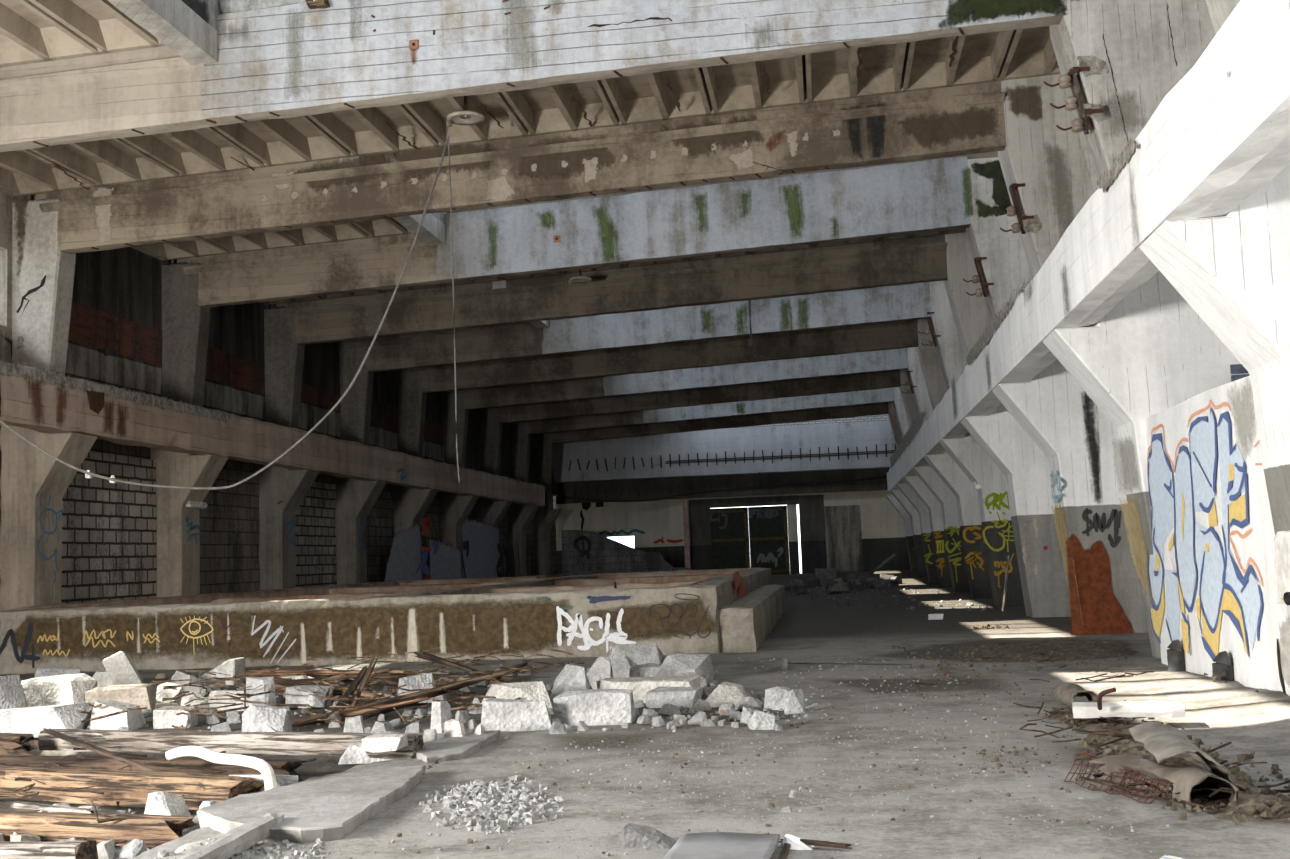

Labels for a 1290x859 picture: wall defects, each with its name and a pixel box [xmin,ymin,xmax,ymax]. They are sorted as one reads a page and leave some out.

crack [588,17,672,27]
crack [16,275,46,314]
rust [28,381,66,425]
rust [87,390,126,436]